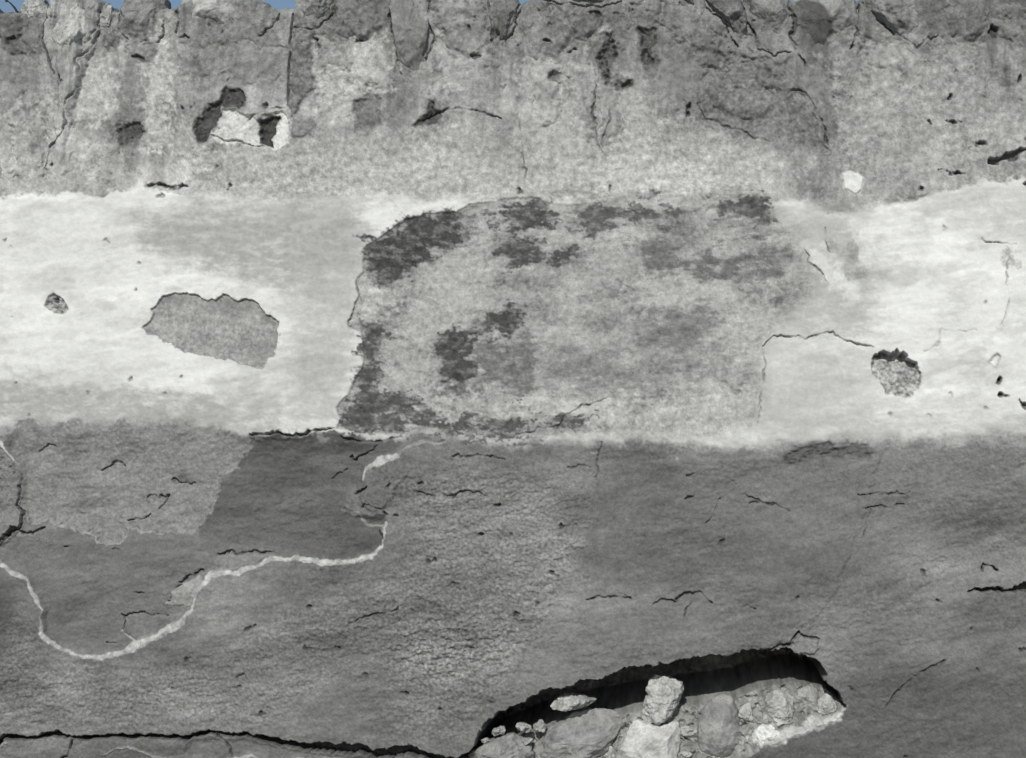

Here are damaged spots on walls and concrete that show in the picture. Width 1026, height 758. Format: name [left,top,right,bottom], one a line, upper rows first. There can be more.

spalling [181,10,323,152]
leakage [121,186,683,310]
leakage [636,189,794,361]
crack [250,427,338,436]
peeling [0,182,875,662]
leakage [278,299,647,451]
crack [355,606,400,623]
crack [967,563,1026,595]
crack [0,730,460,758]
spalling [103,736,368,758]
spalling [460,631,856,758]